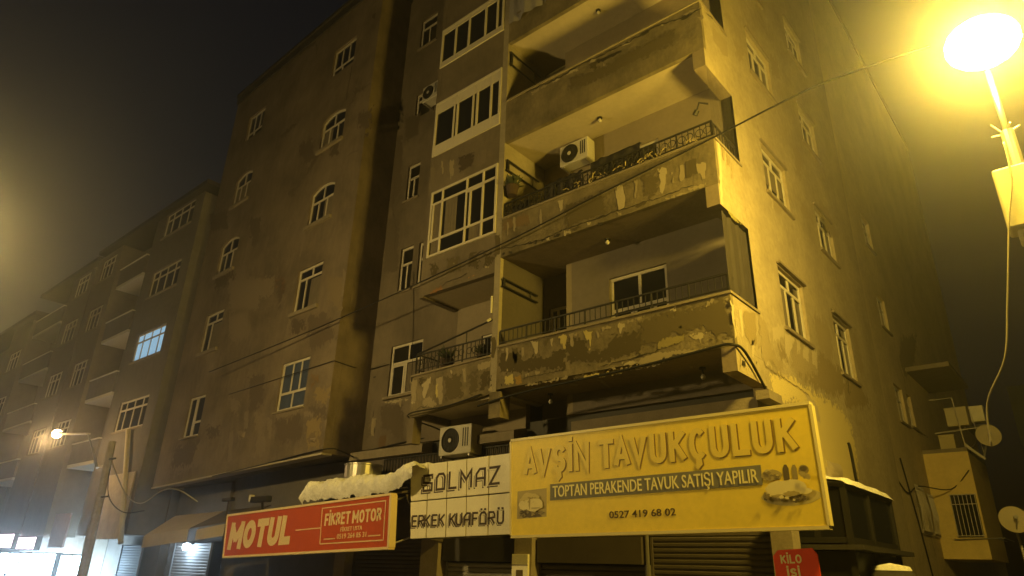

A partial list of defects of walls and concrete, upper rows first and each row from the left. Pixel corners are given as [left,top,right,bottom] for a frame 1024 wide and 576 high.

peeling [584,298,737,378]
spalling [488,371,568,391]